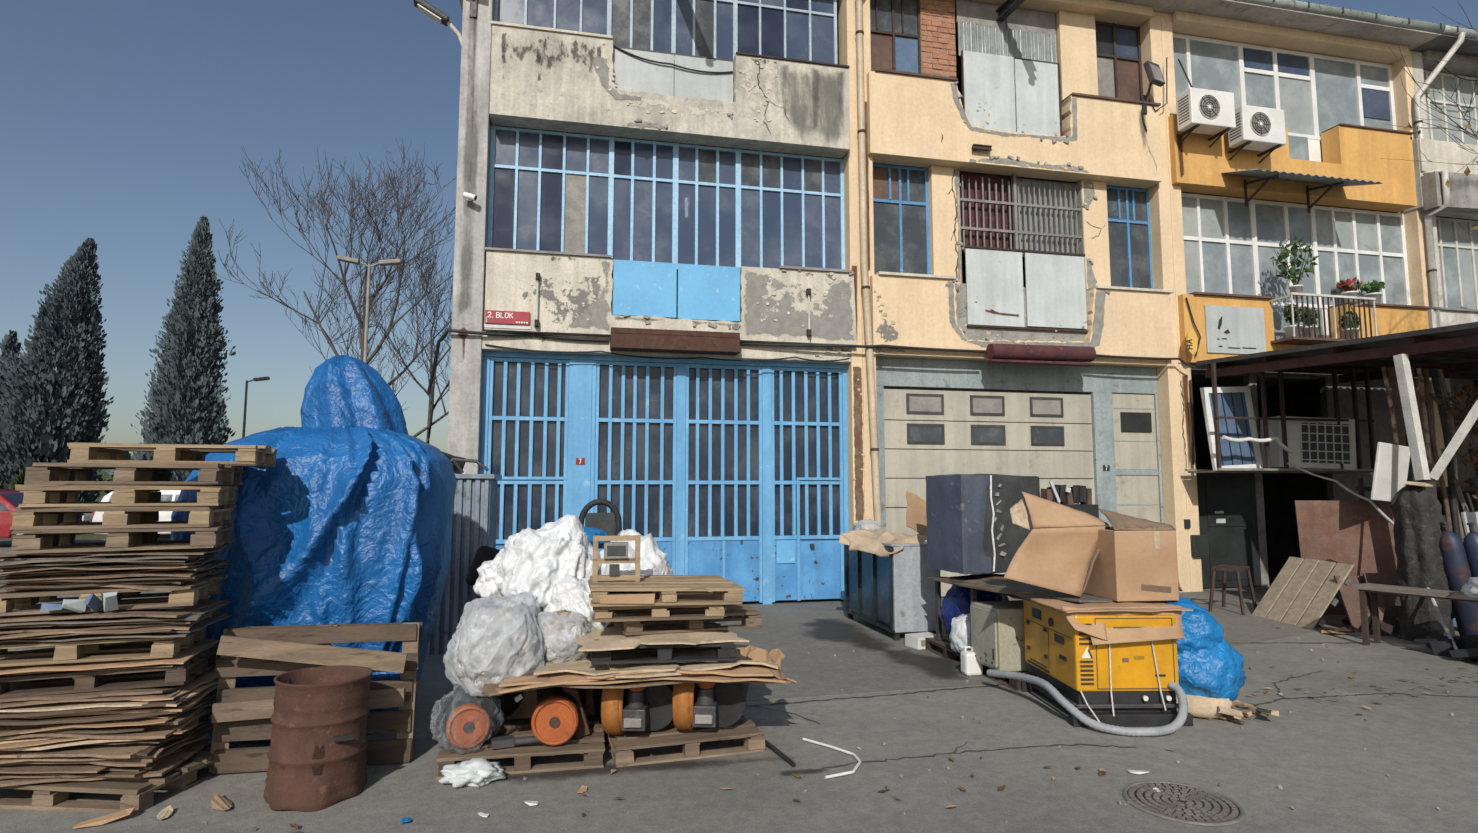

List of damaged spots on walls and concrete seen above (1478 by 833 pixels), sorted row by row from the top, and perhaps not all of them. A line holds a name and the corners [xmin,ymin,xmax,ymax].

damp [785,67,842,136]
spalling [951,81,1077,144]
spalling [945,155,1110,348]
peeling [523,261,651,330]
peeling [692,269,866,530]